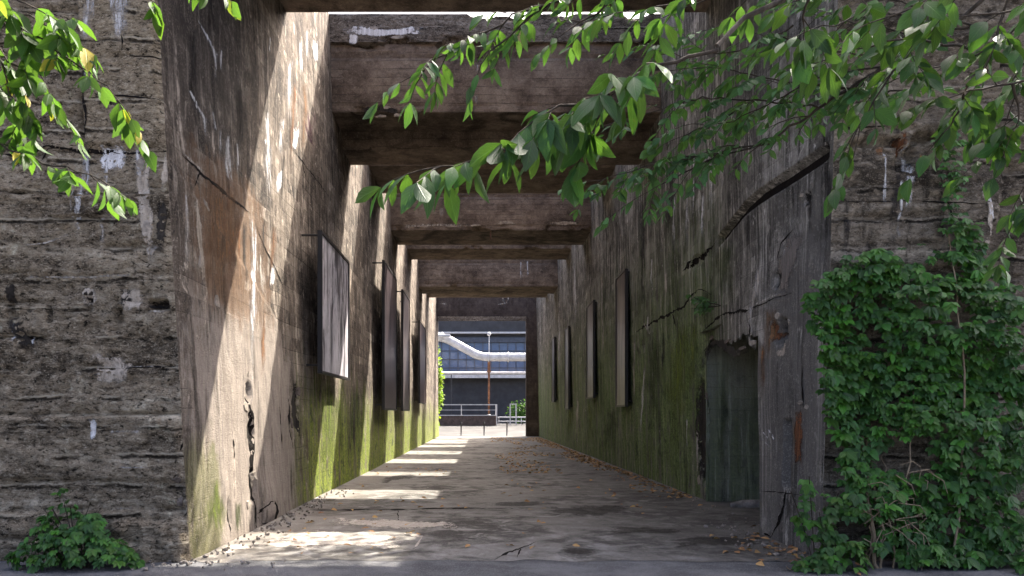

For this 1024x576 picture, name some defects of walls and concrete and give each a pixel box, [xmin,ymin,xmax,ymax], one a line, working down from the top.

water stain [71,146,125,220]
crack [37,69,248,212]
water stain [883,127,914,220]
crack [636,243,791,343]
crack [227,371,279,531]
corrosion [794,373,809,462]
crack [762,491,802,538]